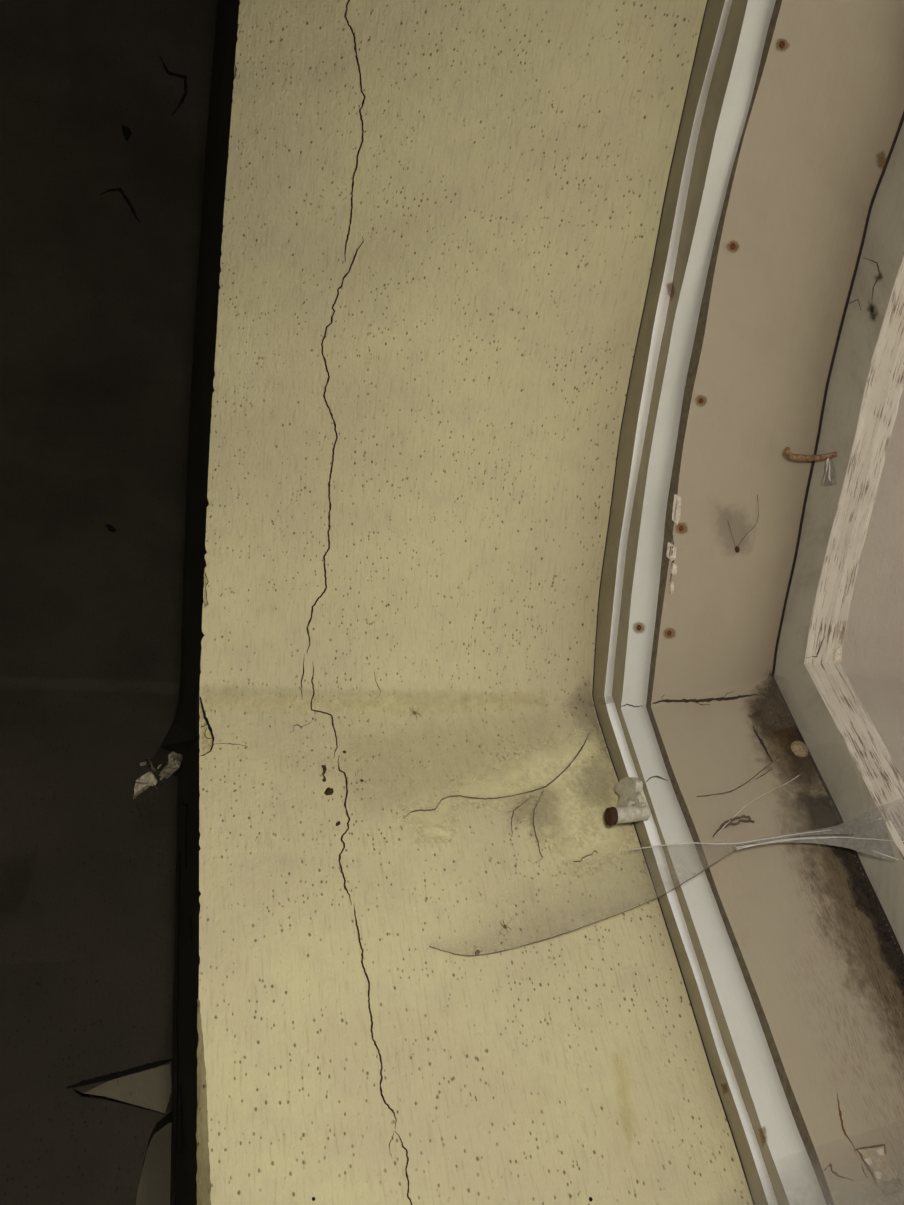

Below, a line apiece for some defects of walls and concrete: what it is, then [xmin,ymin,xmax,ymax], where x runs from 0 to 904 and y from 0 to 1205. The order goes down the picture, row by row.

crack [290,0,412,1205]
spalling [133,751,183,824]
crack [407,730,592,862]
peeling [406,731,633,866]